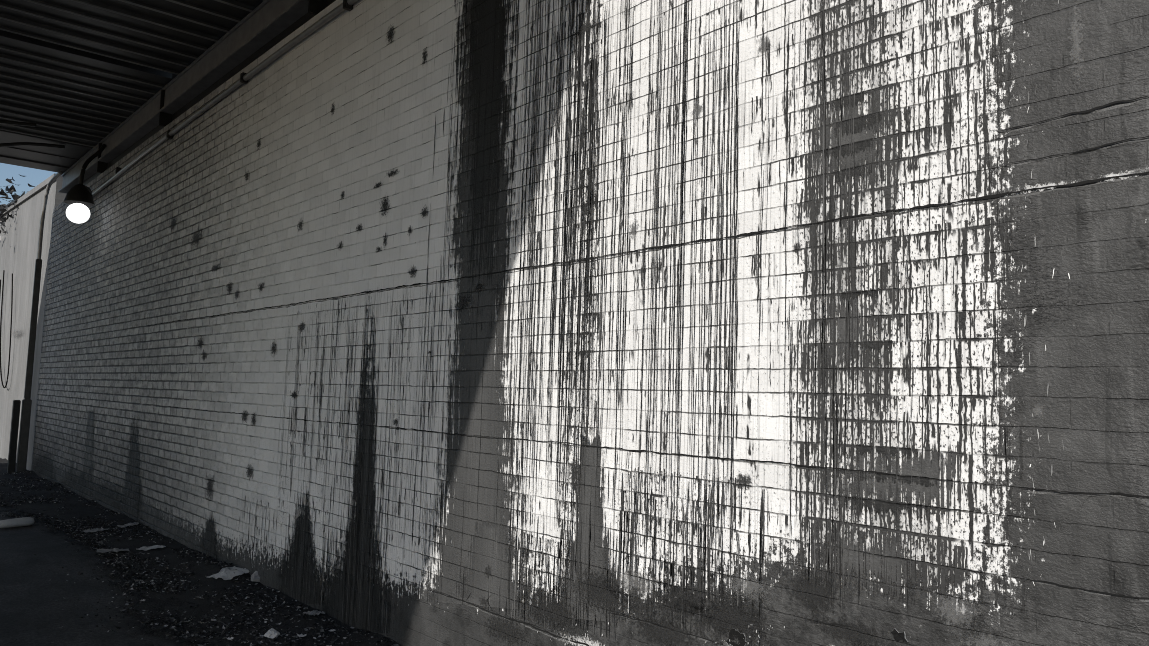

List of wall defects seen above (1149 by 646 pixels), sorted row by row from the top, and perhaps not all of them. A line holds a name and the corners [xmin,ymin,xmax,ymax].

crack [998,96,1149,133]
leakage [1068,4,1083,77]
crack [147,136,1149,327]
leakage [239,0,1076,646]